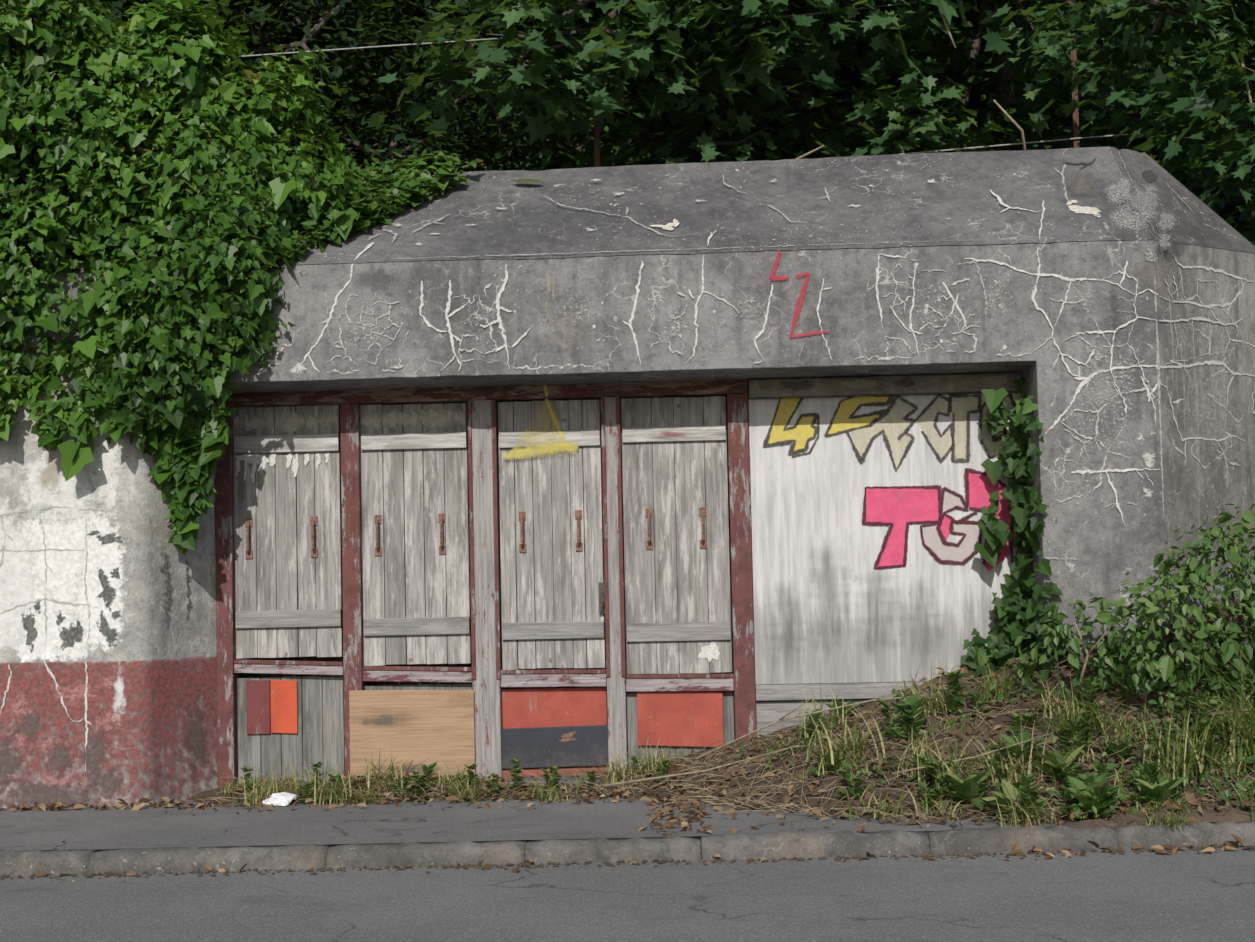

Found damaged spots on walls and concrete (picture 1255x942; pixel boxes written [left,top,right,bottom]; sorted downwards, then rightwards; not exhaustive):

crack [238,214,533,376]
crack [543,195,773,365]
crack [817,279,832,360]
crack [876,157,1255,525]
peeling [0,422,128,663]
peeling [235,453,329,483]
peeling [9,731,71,789]
crack [0,506,116,771]
peeling [52,676,117,706]